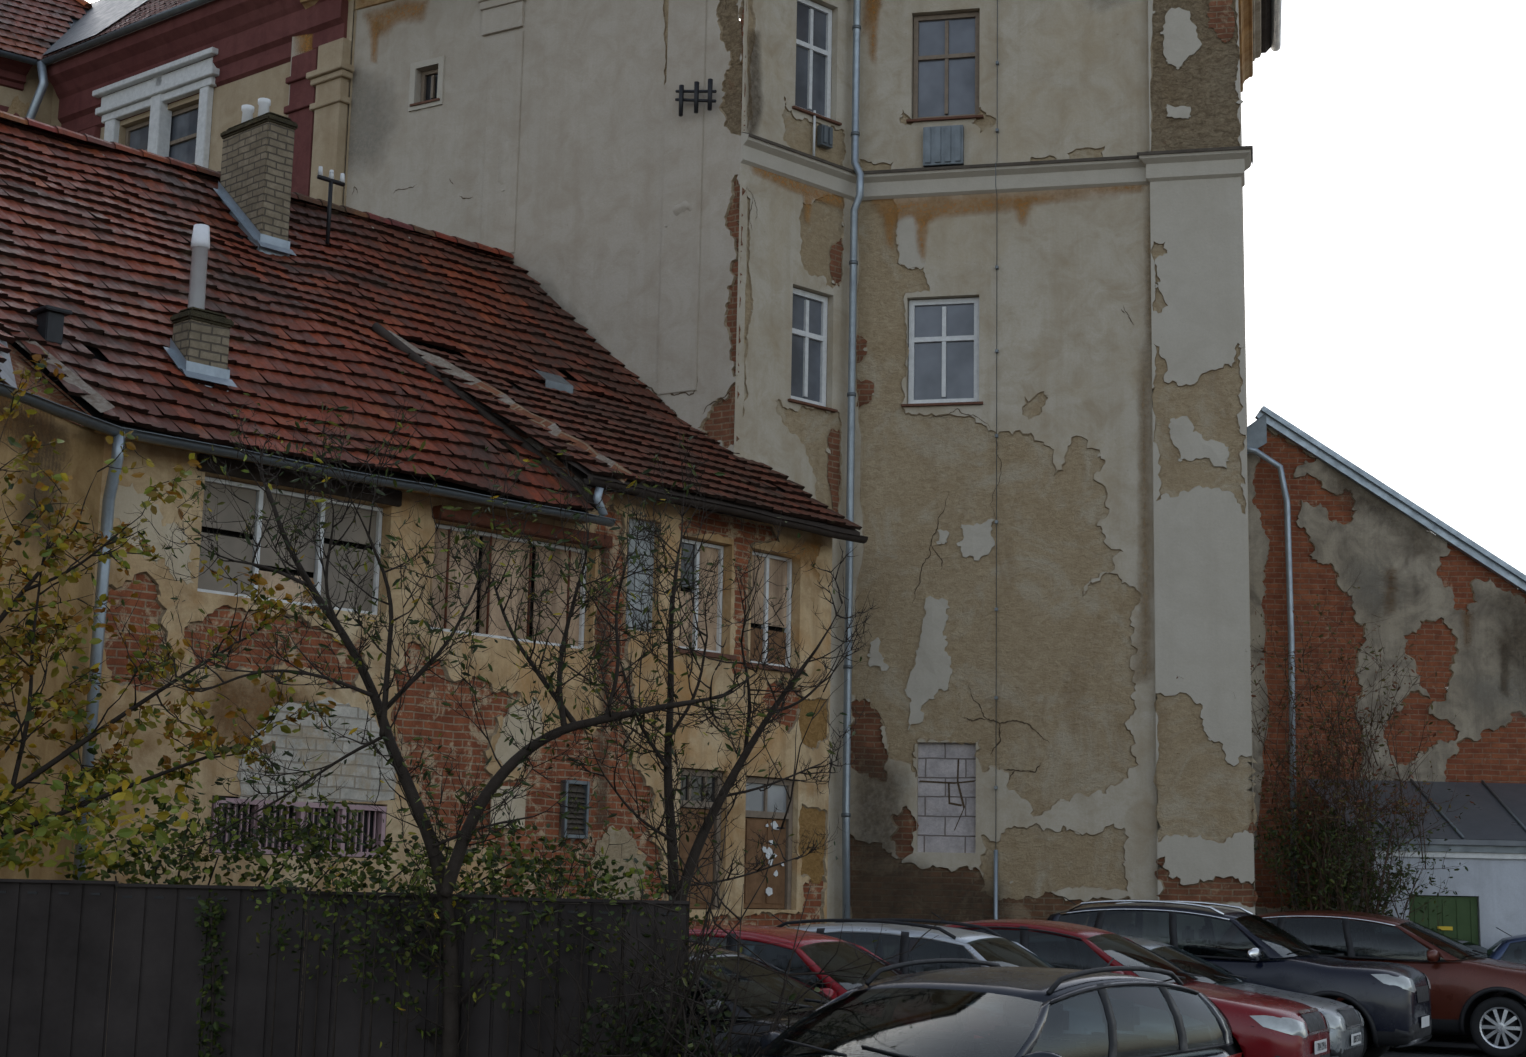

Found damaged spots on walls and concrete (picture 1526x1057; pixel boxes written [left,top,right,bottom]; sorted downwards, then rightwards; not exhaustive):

flaking render [716,0,756,136]
flaking render [1150,0,1243,151]
flaking render [698,174,754,448]
flaking render [1151,242,1168,313]
flaking render [104,483,668,900]
flaking render [678,510,780,674]
flaking render [762,681,830,750]
flaking render [775,194,1141,926]
flaking render [1152,343,1367,910]
flaking render [1382,529,1526,784]
flaking render [689,803,828,928]